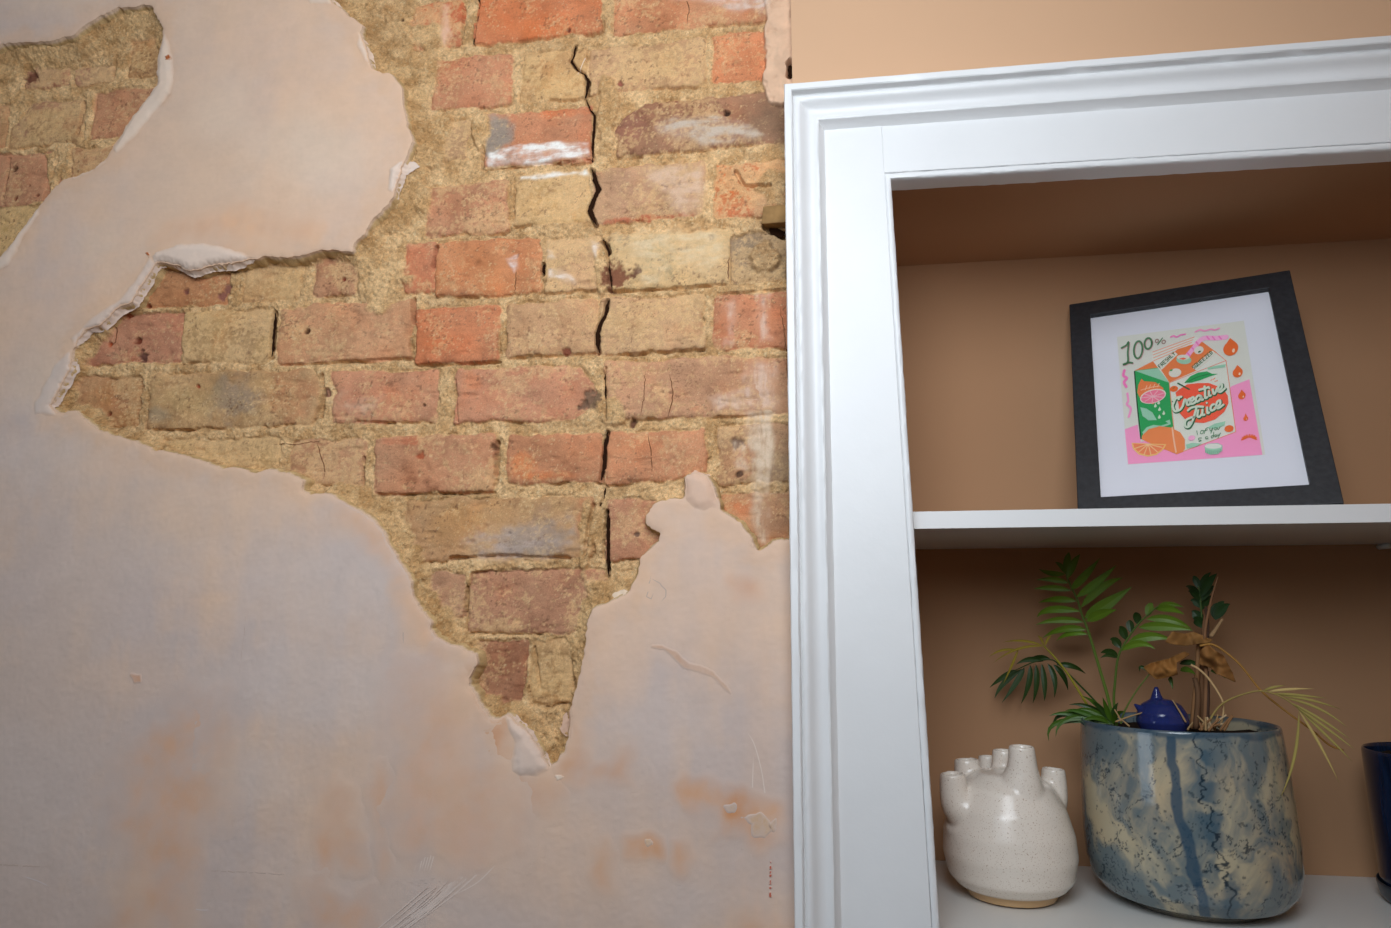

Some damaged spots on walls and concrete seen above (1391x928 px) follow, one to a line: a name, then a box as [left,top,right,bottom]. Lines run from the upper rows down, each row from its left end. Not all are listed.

flaking render [0,4,174,270]
crack [570,46,612,399]
flaking render [51,0,792,777]
crack [600,432,610,569]
crack [641,372,673,465]